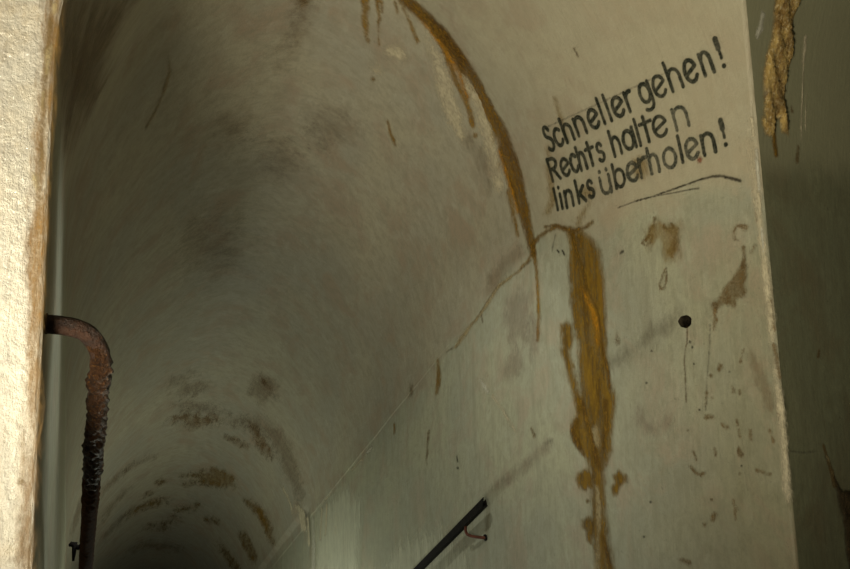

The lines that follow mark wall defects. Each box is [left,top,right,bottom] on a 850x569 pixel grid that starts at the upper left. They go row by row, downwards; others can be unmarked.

corrosion [395,0,626,569]
damp [712,247,754,327]